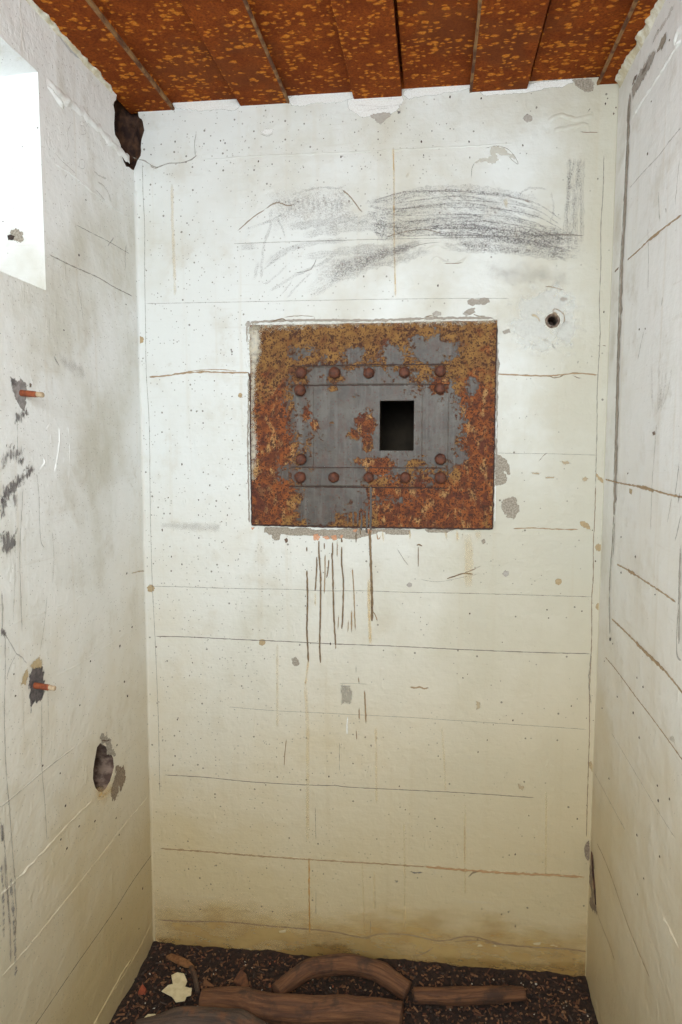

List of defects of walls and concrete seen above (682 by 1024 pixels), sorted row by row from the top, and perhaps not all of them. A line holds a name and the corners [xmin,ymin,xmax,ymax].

corrosion [249,326,498,663]
crack [150,95,682,976]
spalling [100,733,126,801]
spalling [584,841,597,914]